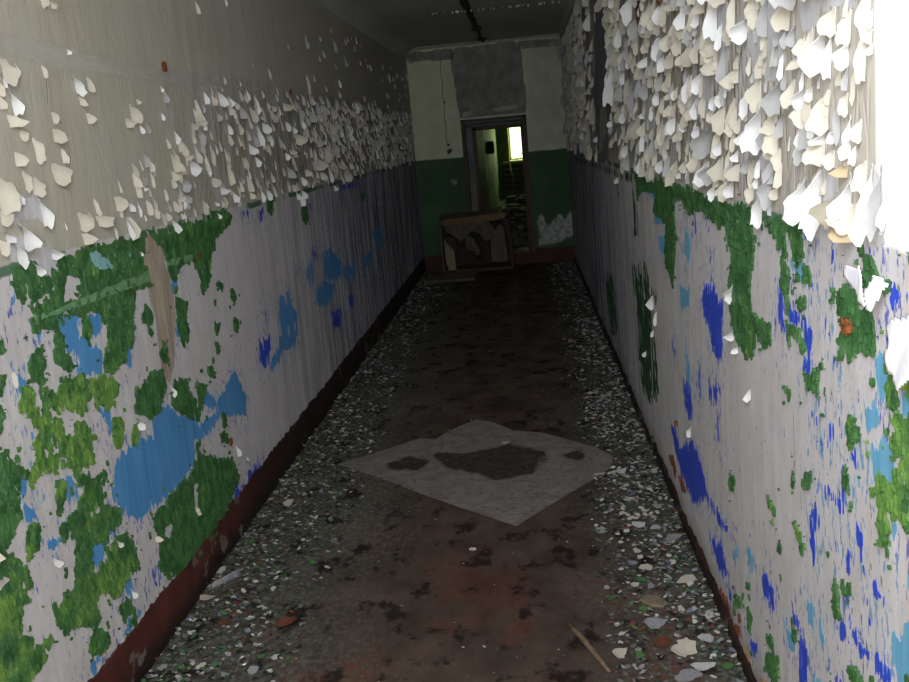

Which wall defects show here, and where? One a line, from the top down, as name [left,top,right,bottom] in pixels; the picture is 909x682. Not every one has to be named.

peeling [0,27,415,682]